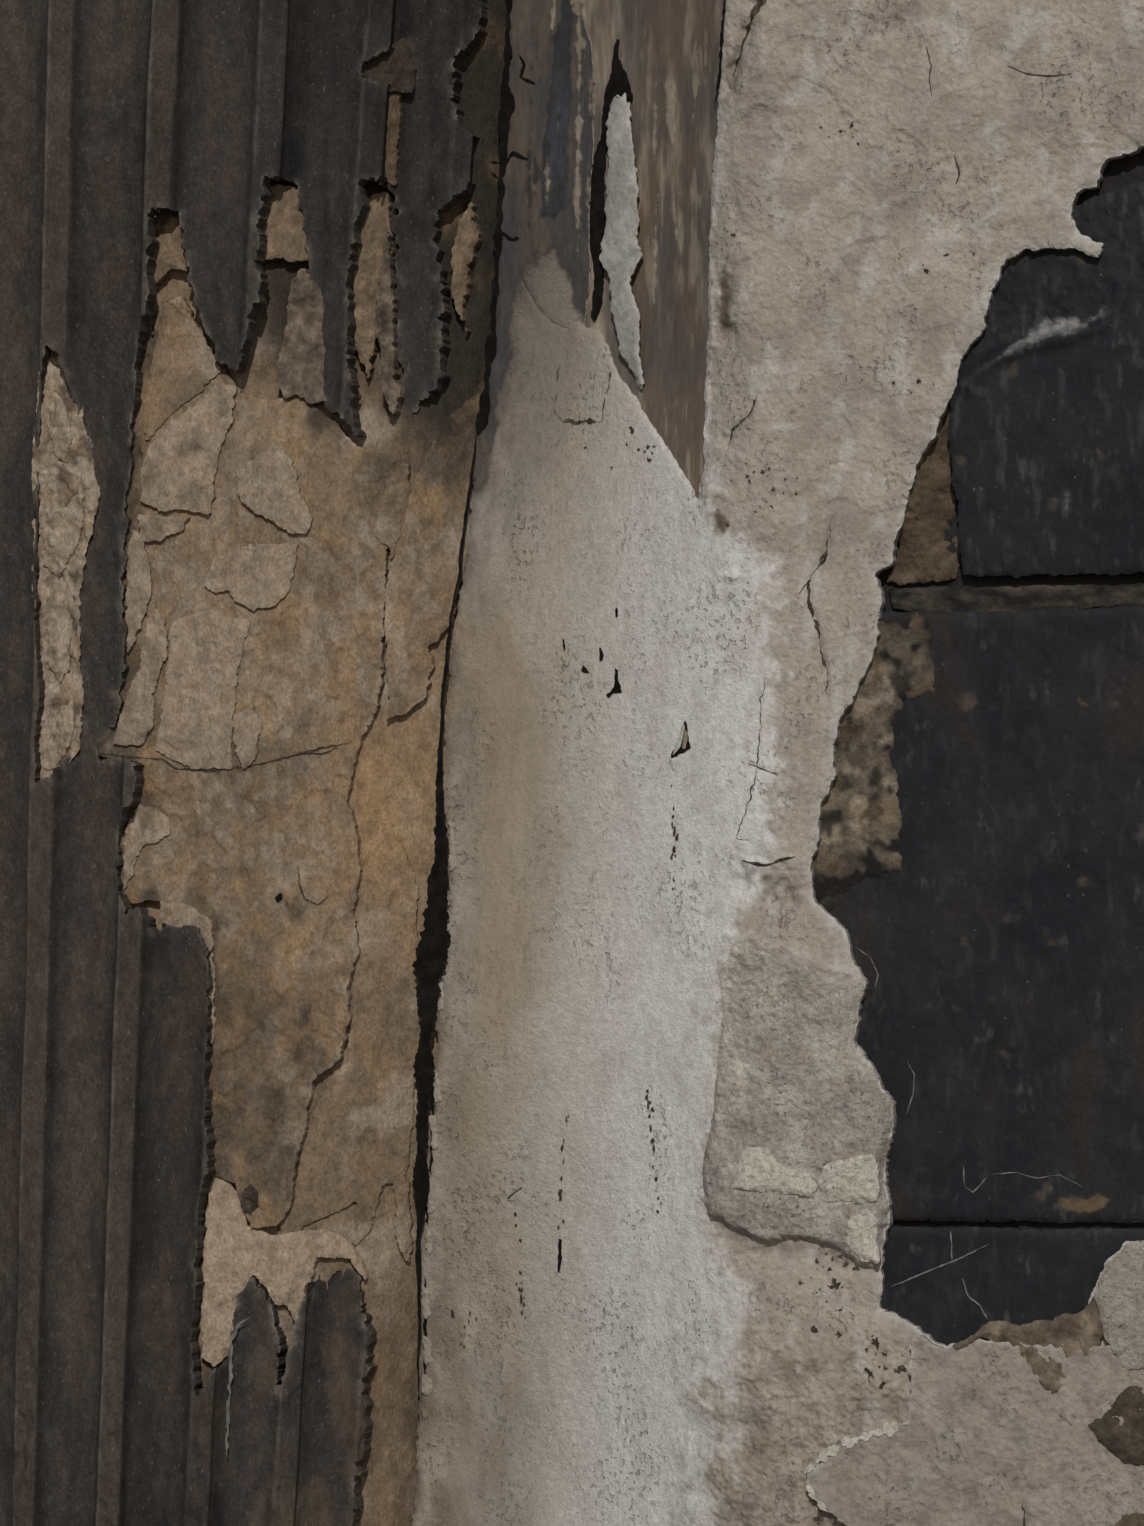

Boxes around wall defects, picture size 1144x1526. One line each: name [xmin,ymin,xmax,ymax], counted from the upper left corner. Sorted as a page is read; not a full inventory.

peeling [581,0,740,499]
spalling [887,405,961,586]
spalling [31,0,507,1526]
spalling [813,612,935,911]